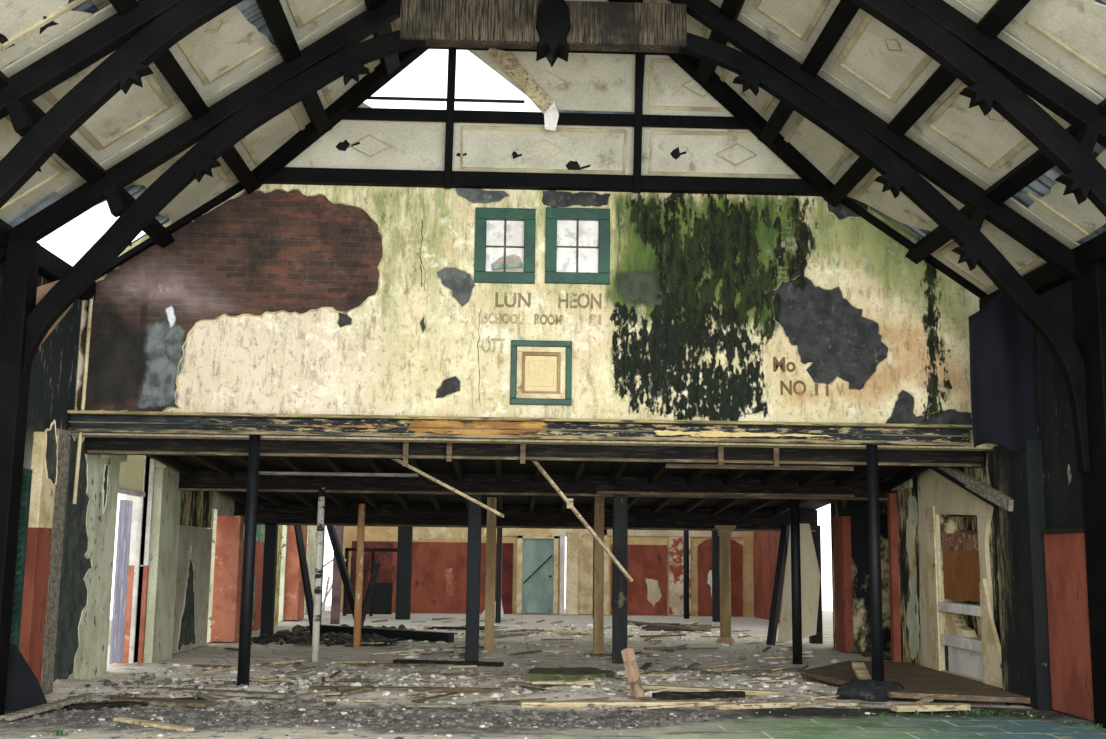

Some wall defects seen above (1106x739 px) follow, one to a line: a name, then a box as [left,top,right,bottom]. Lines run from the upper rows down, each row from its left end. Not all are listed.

flaking render [75,188,384,412]
flaking render [435,375,461,399]
flaking render [436,266,475,308]
mould [610,193,817,421]
flaking render [771,275,889,391]
flaking render [885,389,972,431]
mould [920,262,952,421]
peeling [646,578,662,608]